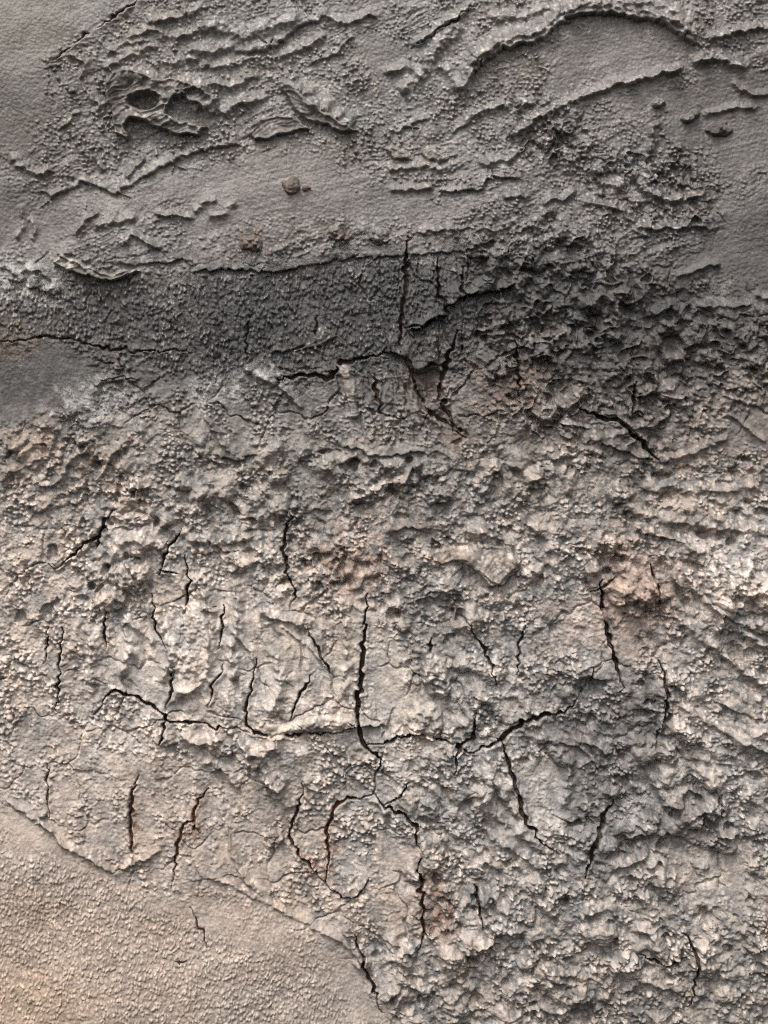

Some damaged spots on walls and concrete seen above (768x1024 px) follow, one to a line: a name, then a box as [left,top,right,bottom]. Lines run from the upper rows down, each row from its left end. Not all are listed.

flaking render [53,254,140,282]
crack [277,239,467,421]
spalling [4,423,55,470]
spalling [403,362,470,451]
crack [103,604,225,744]
crack [151,528,193,648]
crack [244,594,577,850]
flaking render [421,543,517,627]
crack [590,580,623,685]
crack [288,783,426,946]
spalling [612,825,653,867]
flaking render [579,920,619,946]